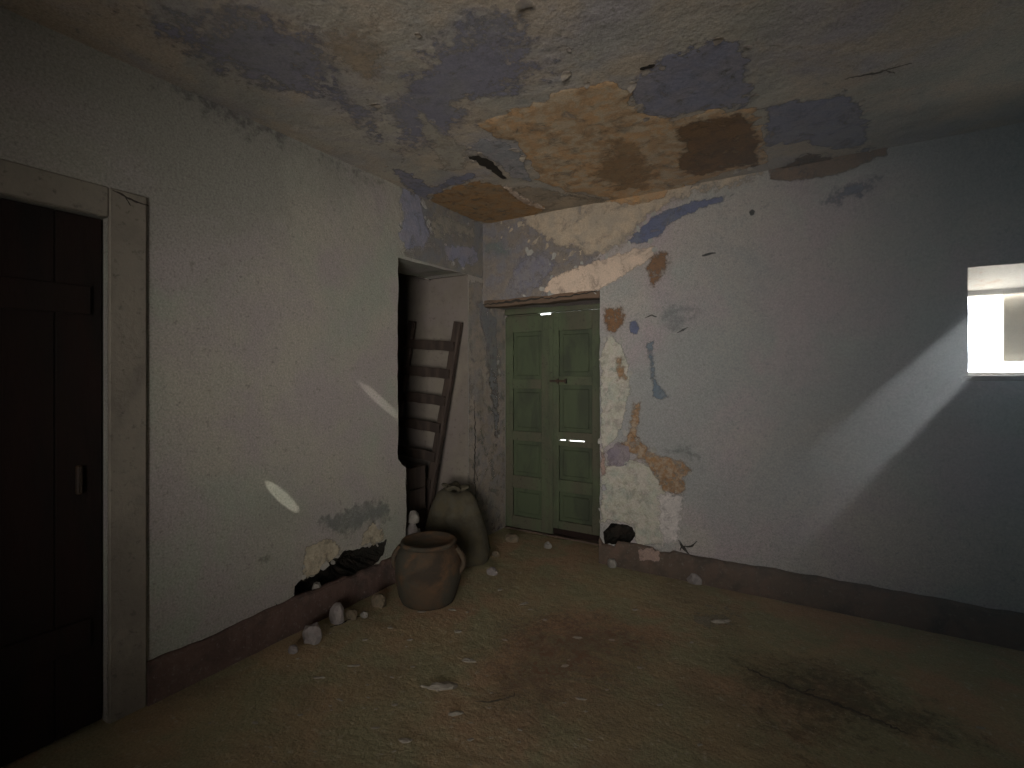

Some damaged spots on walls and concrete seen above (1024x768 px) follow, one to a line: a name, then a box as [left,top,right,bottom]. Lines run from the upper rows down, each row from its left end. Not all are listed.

flaking render [383,81,768,296]
flaking render [598,321,670,562]
spalling [294,539,387,596]